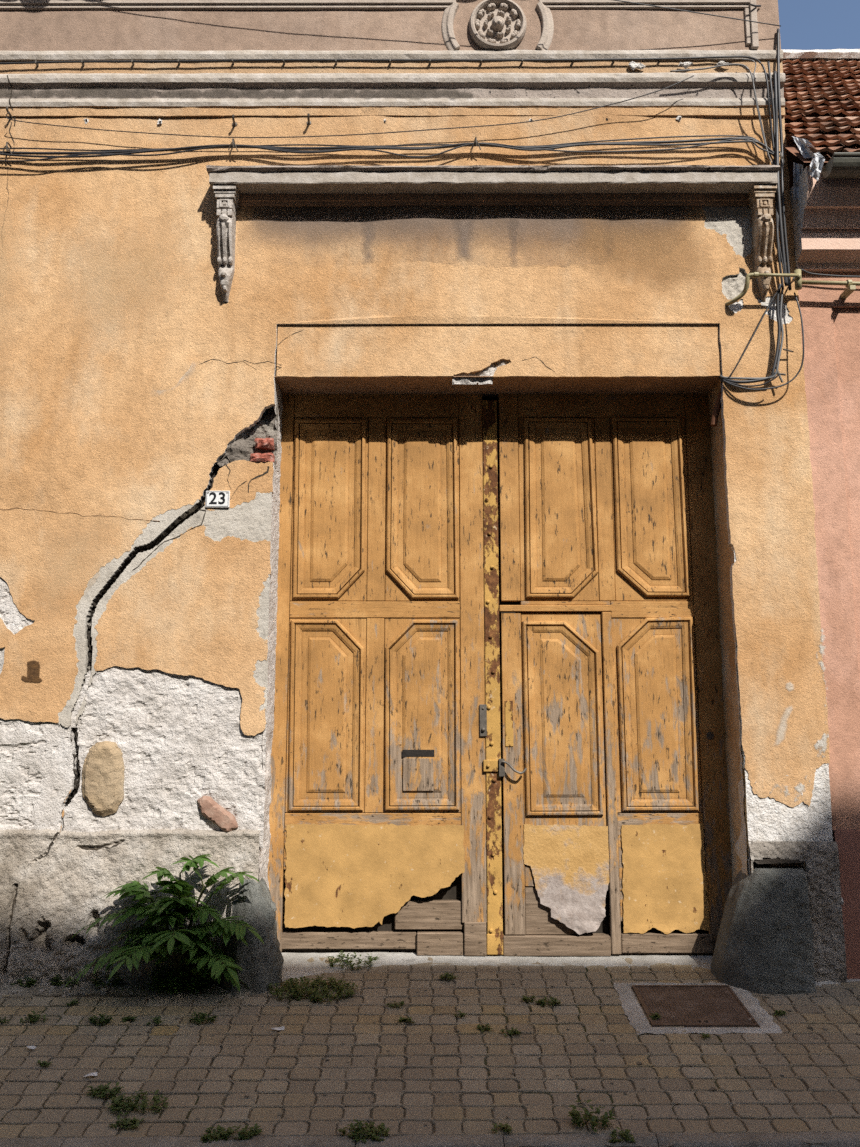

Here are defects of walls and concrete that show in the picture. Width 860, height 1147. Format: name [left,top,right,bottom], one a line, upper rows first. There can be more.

crack [1,75,16,248]
crack [1,456,269,861]
flaking render [0,492,272,849]
flaking render [735,630,833,876]
crack [6,885,18,969]